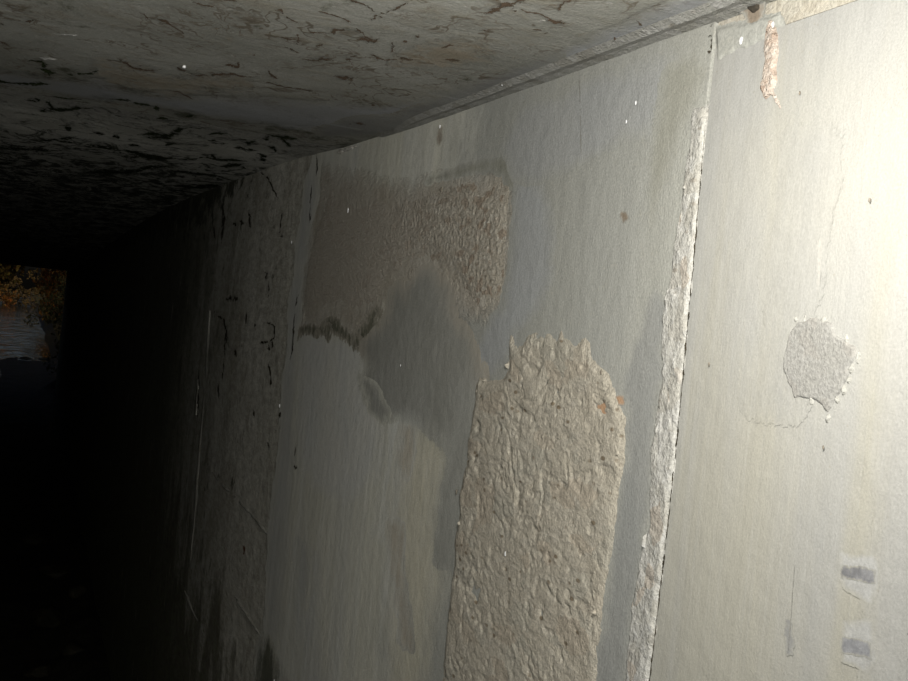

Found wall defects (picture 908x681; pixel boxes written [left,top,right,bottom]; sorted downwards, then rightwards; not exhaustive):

crack [278,0,419,81]
crack [482,0,576,34]
crack [0,54,312,199]
spalling [304,181,509,310]
water stain [294,156,513,681]
spalling [625,104,709,681]
spalling [443,331,626,681]